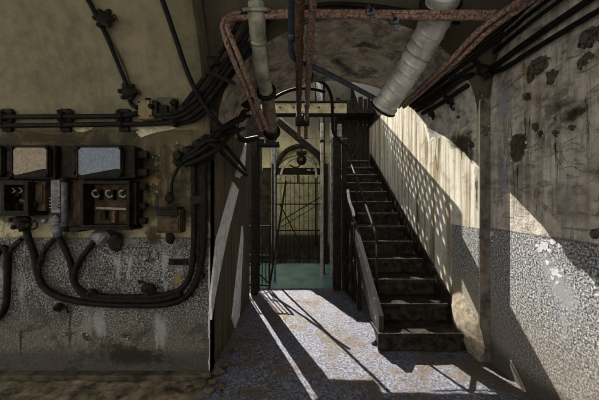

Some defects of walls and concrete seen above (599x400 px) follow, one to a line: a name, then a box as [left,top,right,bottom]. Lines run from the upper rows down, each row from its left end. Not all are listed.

spalling [575,23,599,70]
spalling [526,54,559,88]
spalling [508,131,528,188]
spalling [531,121,560,158]